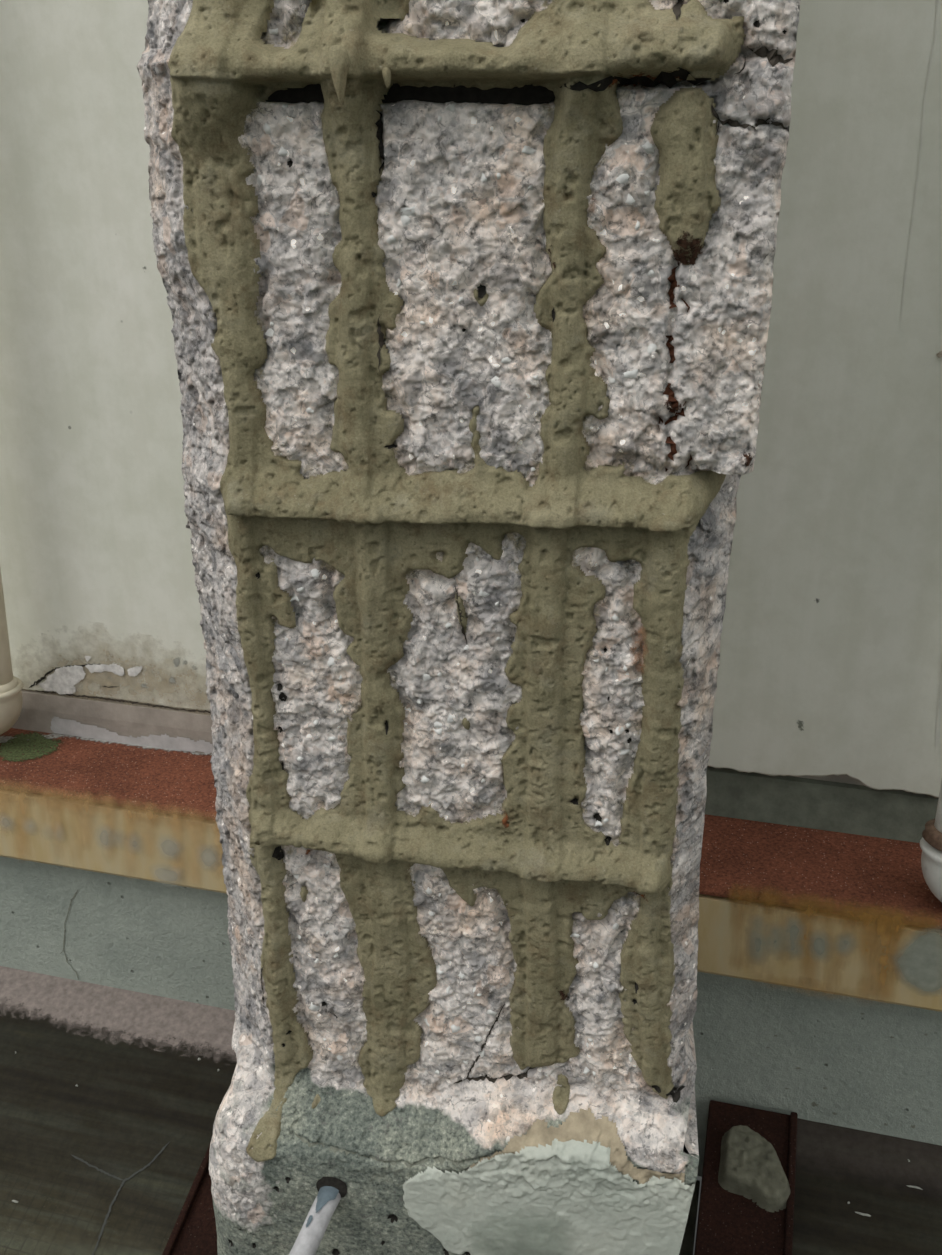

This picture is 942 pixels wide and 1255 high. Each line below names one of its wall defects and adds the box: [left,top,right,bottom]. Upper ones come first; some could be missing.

spalling [376,0,555,47]
spalling [372,67,711,487]
crack [654,266,692,471]
rust [672,231,704,266]
spalling [38,0,368,1068]
peeling [385,474,741,1255]
crack [453,1004,536,1084]